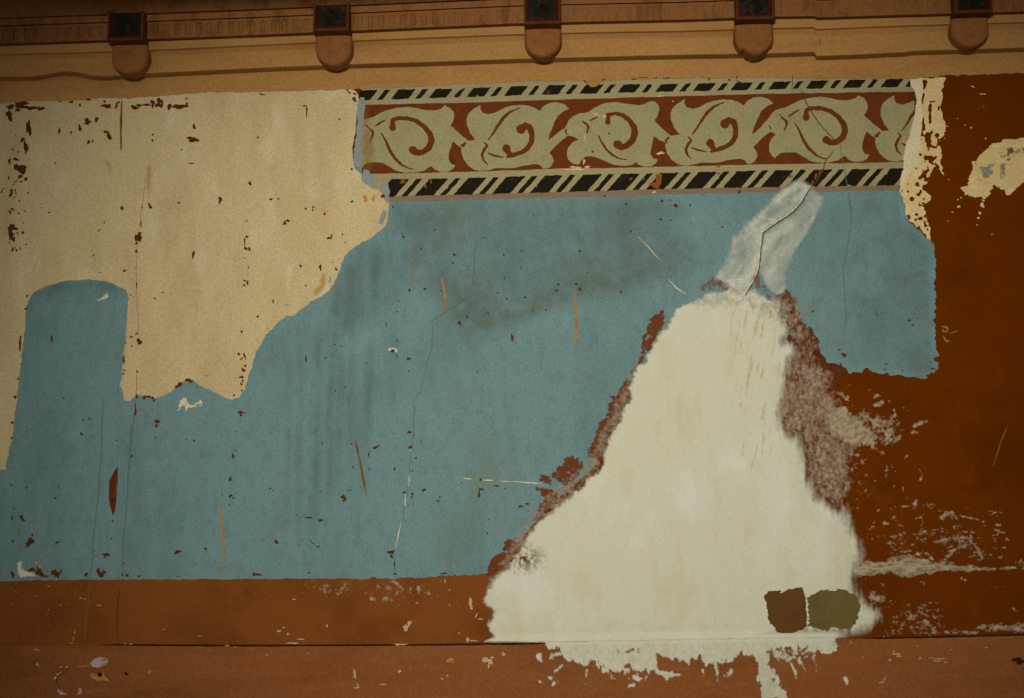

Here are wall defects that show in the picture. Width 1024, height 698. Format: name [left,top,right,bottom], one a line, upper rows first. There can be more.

peeling [0,89,406,470]
peeling [649,174,691,207]
crack [733,75,852,328]
peeling [899,74,967,240]
peeling [961,138,1024,199]